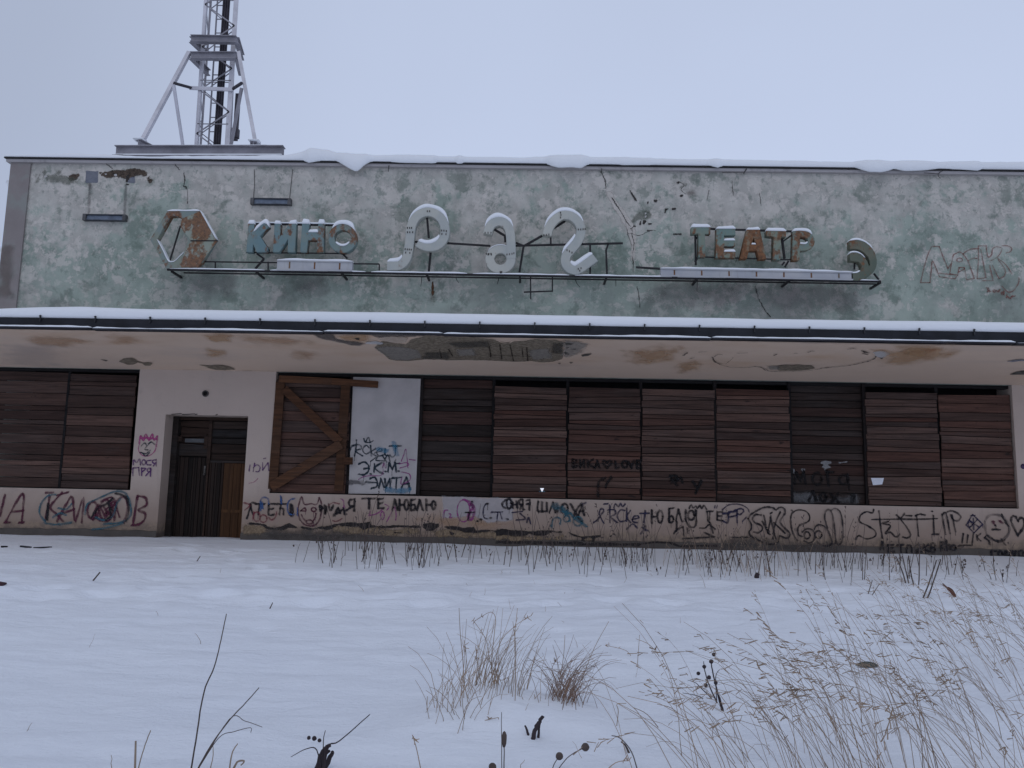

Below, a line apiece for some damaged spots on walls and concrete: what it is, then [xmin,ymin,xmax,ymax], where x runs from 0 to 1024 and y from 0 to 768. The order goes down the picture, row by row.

peeling [99,168,152,183]
crack [600,168,655,307]
flaking render [103,358,152,366]
spalling [314,334,591,364]